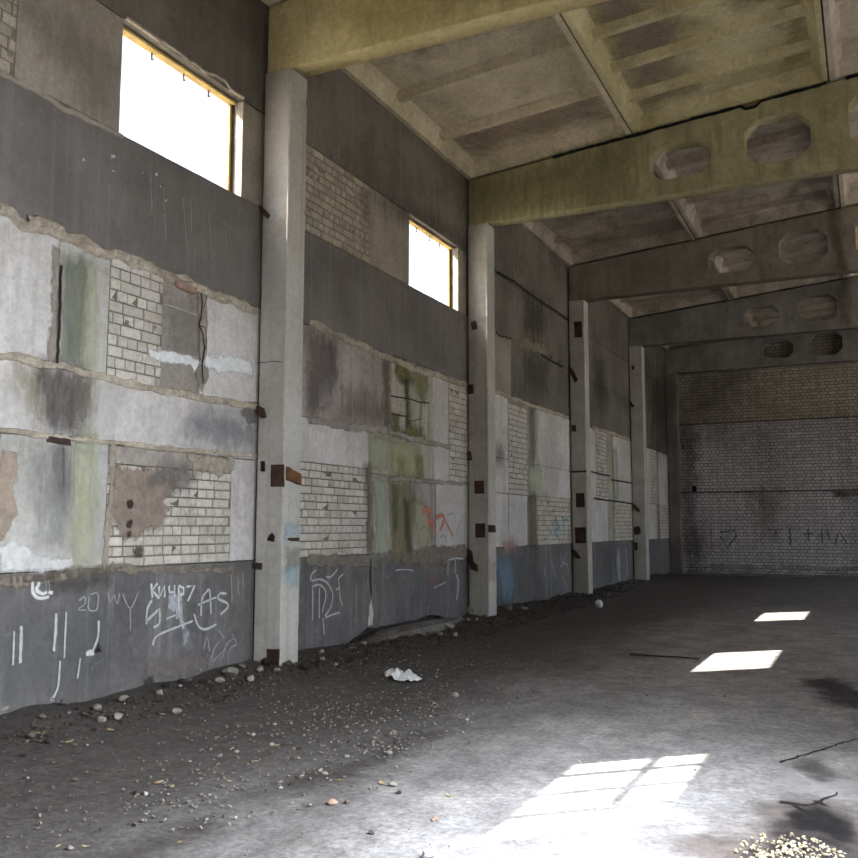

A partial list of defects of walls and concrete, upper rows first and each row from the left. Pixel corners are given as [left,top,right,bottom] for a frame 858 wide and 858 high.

crack [55,265,63,364]
spalling [0,202,259,423]
crack [496,271,569,321]
crack [541,354,563,368]
peeling [0,427,265,588]